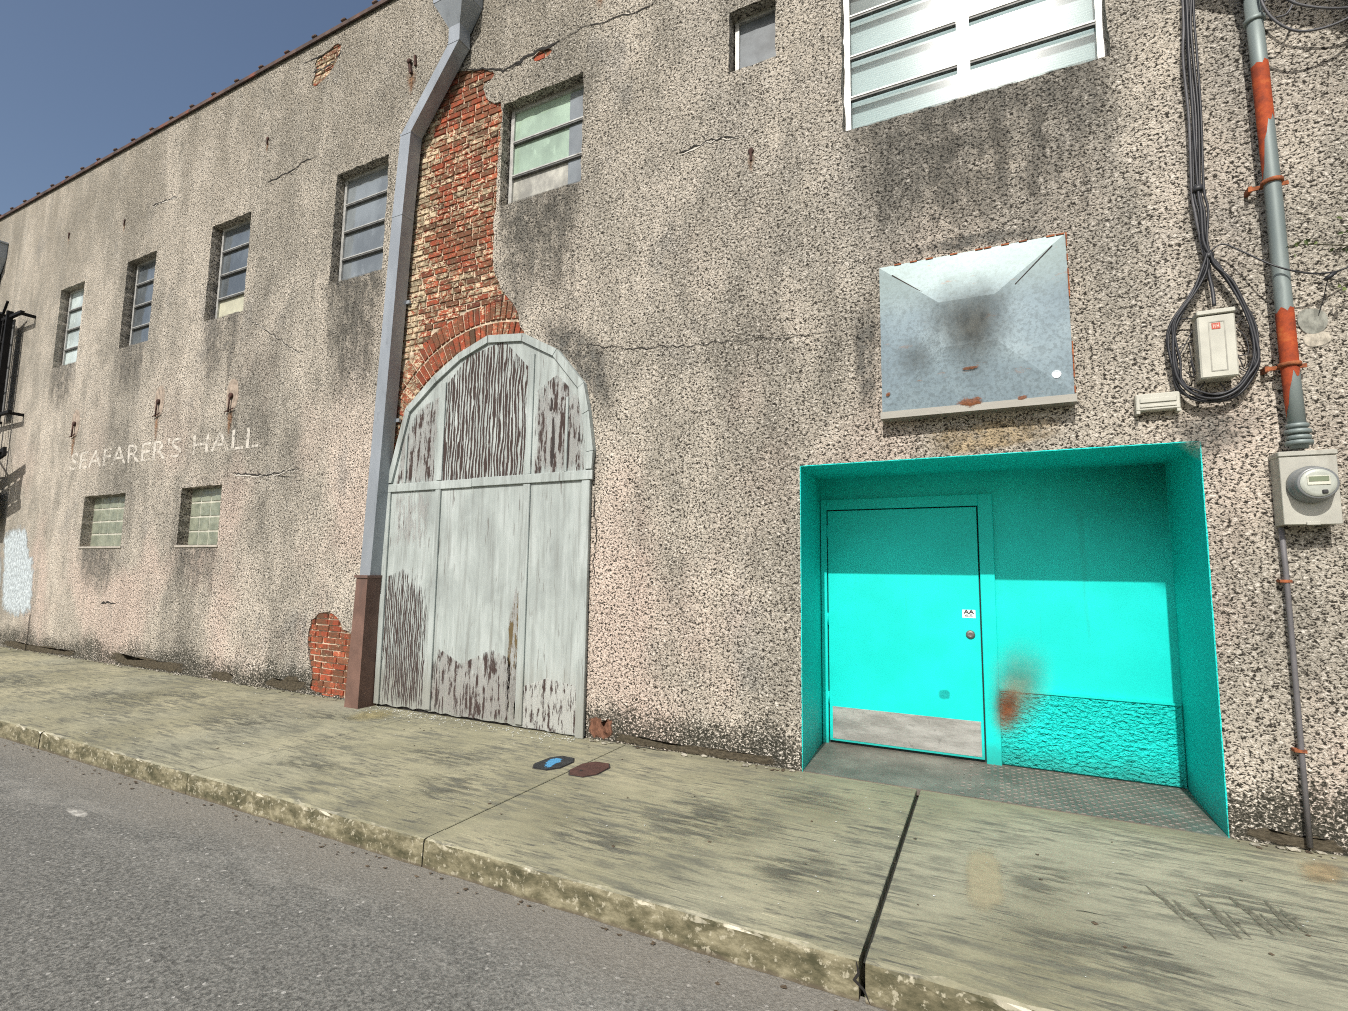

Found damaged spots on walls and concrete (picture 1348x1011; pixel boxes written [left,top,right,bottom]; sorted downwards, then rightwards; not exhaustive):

spalling [313,44,341,87]
crack [465,0,655,74]
crack [678,135,740,155]
water stain [870,62,1080,211]
corrosion [1250,58,1275,180]
spalling [393,70,584,484]
corrosion [1046,232,1070,299]
corrosion [1275,306,1301,418]
spalling [205,612,351,698]
corrosion [1001,678,1026,720]